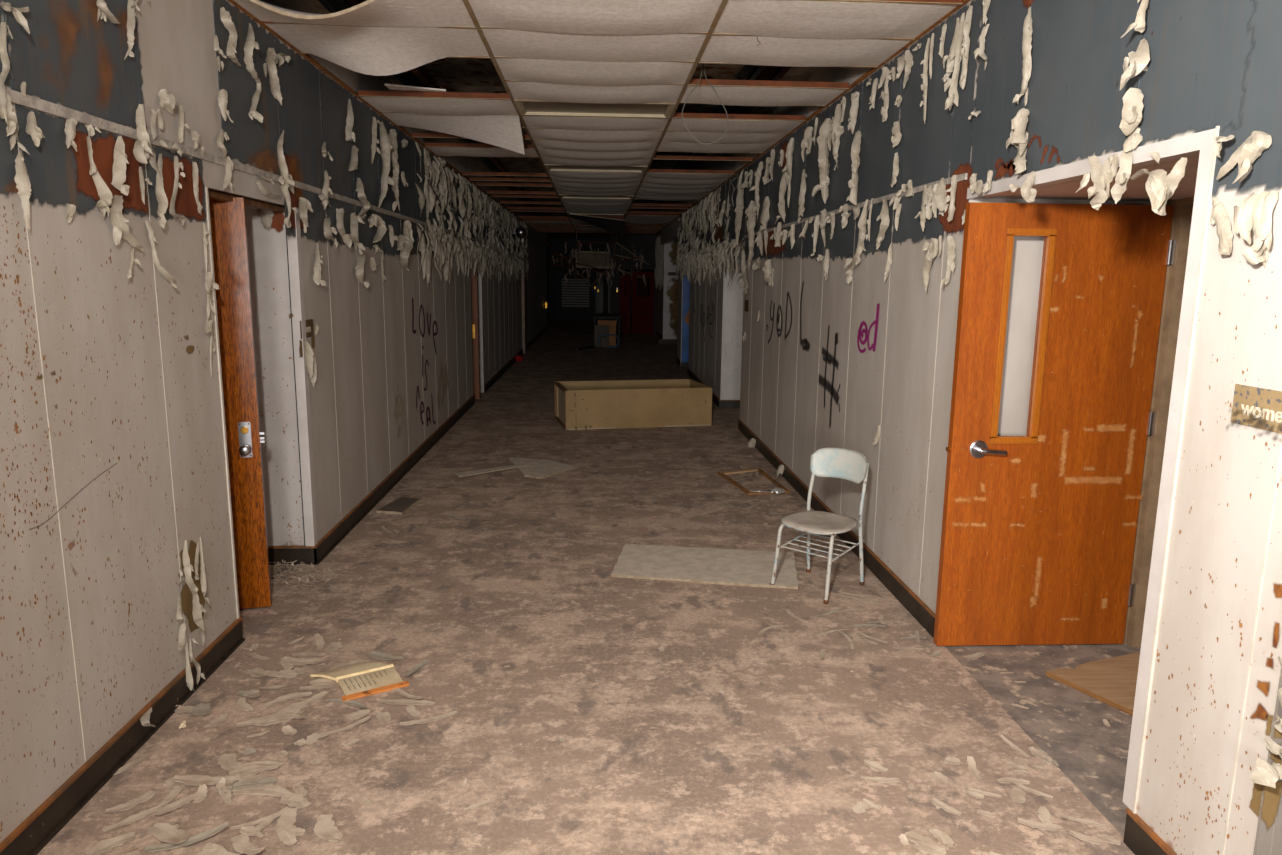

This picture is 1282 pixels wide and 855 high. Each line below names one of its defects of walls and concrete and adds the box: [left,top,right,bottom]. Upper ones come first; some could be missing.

rust [72,131,148,213]
rust [162,156,204,221]
rust [939,163,972,233]
peeling [654,0,1282,337]
rust [0,204,226,762]
peeling [176,537,210,691]
rust [1274,584,1282,598]
rust [1147,614,1279,855]
peeling [1250,656,1282,829]